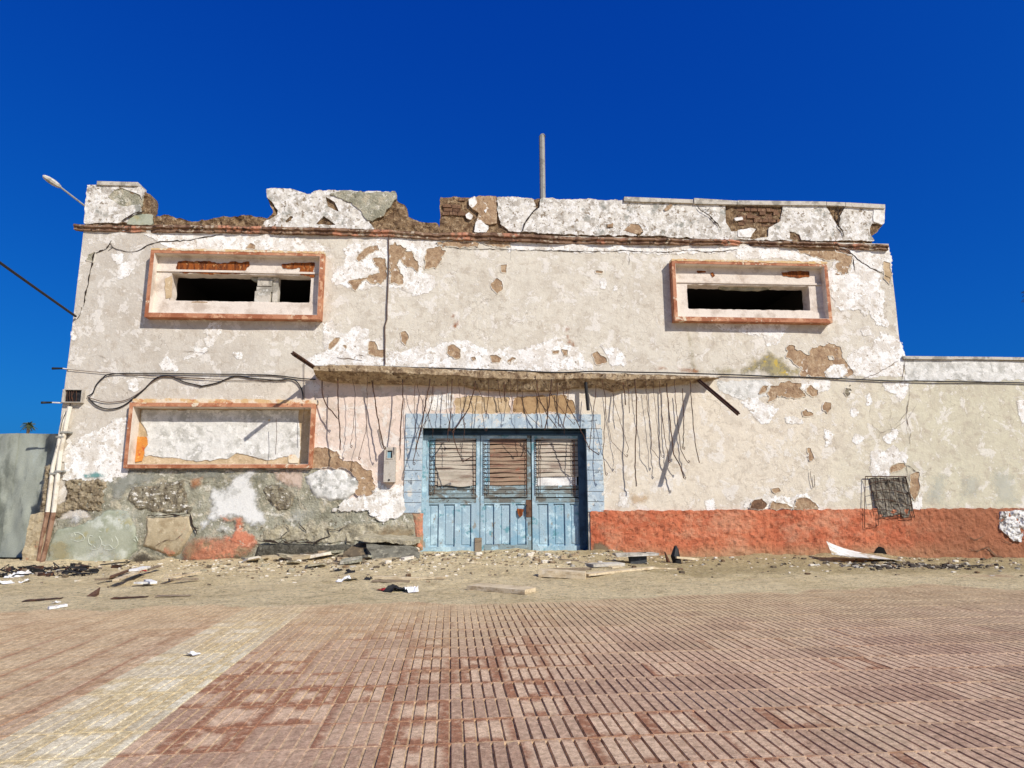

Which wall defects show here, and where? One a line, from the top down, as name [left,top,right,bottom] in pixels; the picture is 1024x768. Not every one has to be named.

peeling [145,196,910,424]
crack [829,206,893,286]
peeling [126,377,423,563]
peeling [305,320,700,508]
peeling [743,487,820,511]
flaking render [999,510,1024,542]